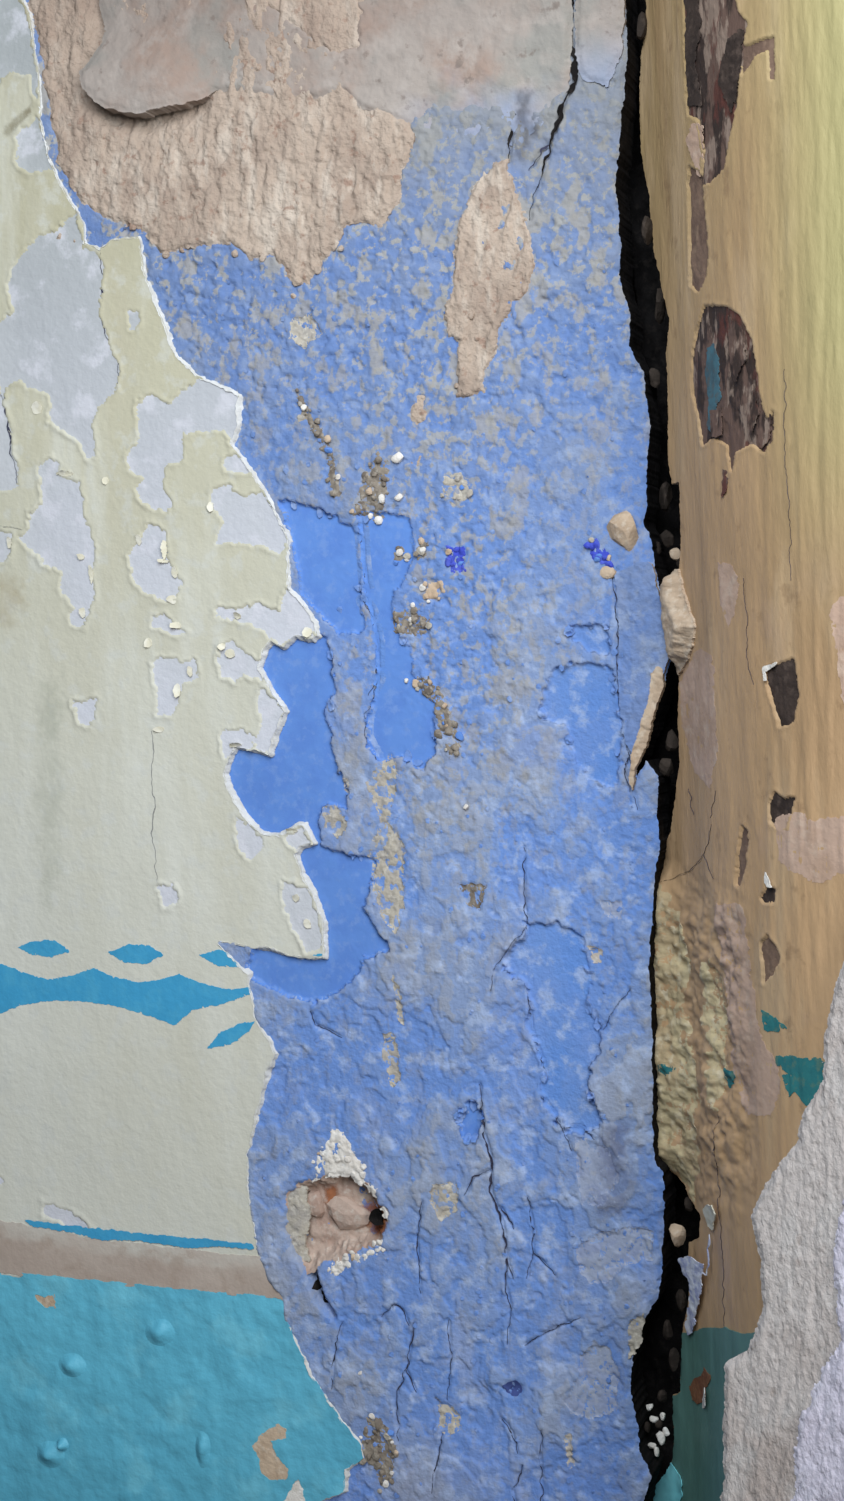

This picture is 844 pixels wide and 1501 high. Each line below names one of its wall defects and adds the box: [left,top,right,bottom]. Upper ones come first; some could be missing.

flaking render [79,0,280,119]
crack [507,0,578,220]
peeling [0,214,120,491]
peeling [127,378,238,512]
crack [627,0,681,575]
peeling [683,0,775,498]
crack [624,675,716,882]
peeling [762,659,799,726]
crack [381,1203,453,1441]
crack [464,1084,579,1345]
crack [643,1114,725,1489]
flaking render [689,962,844,1501]